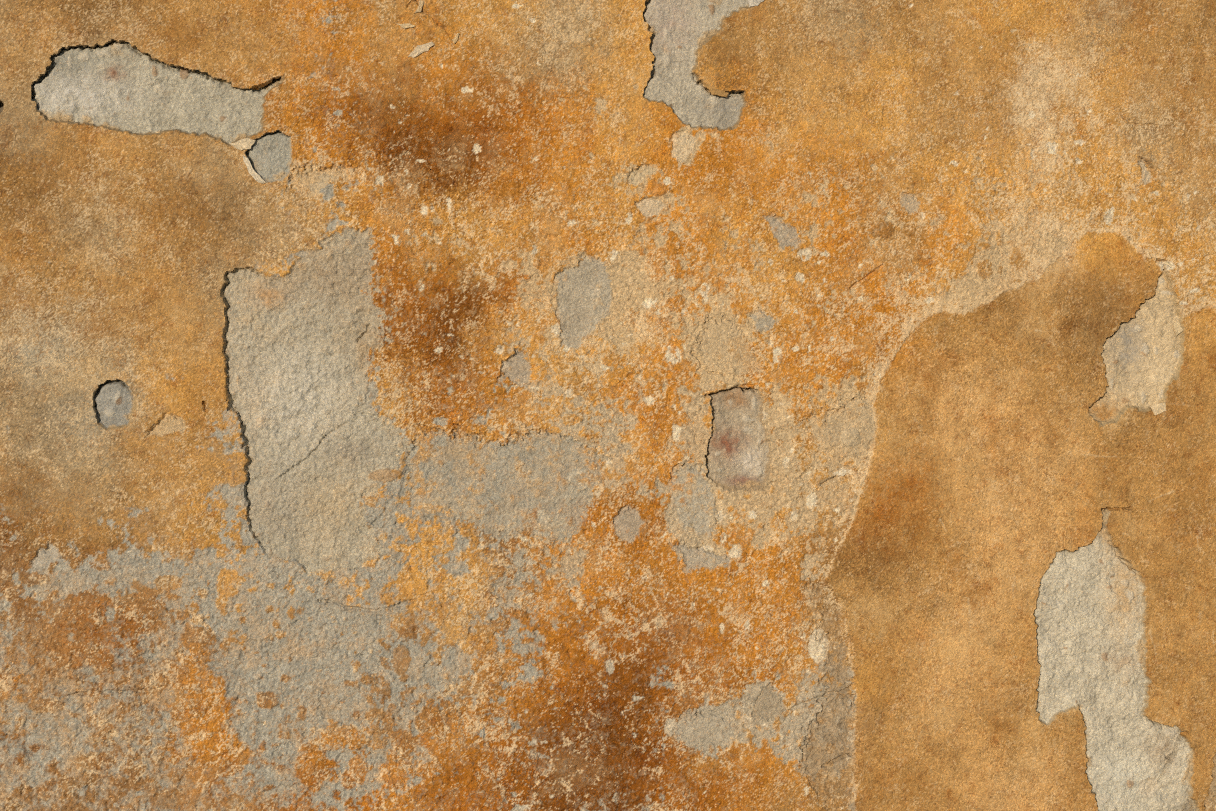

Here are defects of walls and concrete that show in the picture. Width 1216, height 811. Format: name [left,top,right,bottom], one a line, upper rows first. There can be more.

spalling [31,39,364,202]
spalling [626,0,764,219]
spalling [92,379,190,440]
peeling [219,224,614,577]
spalling [663,387,773,576]
peeling [749,307,779,333]
spalling [1088,265,1186,428]
spalling [1033,508,1216,811]